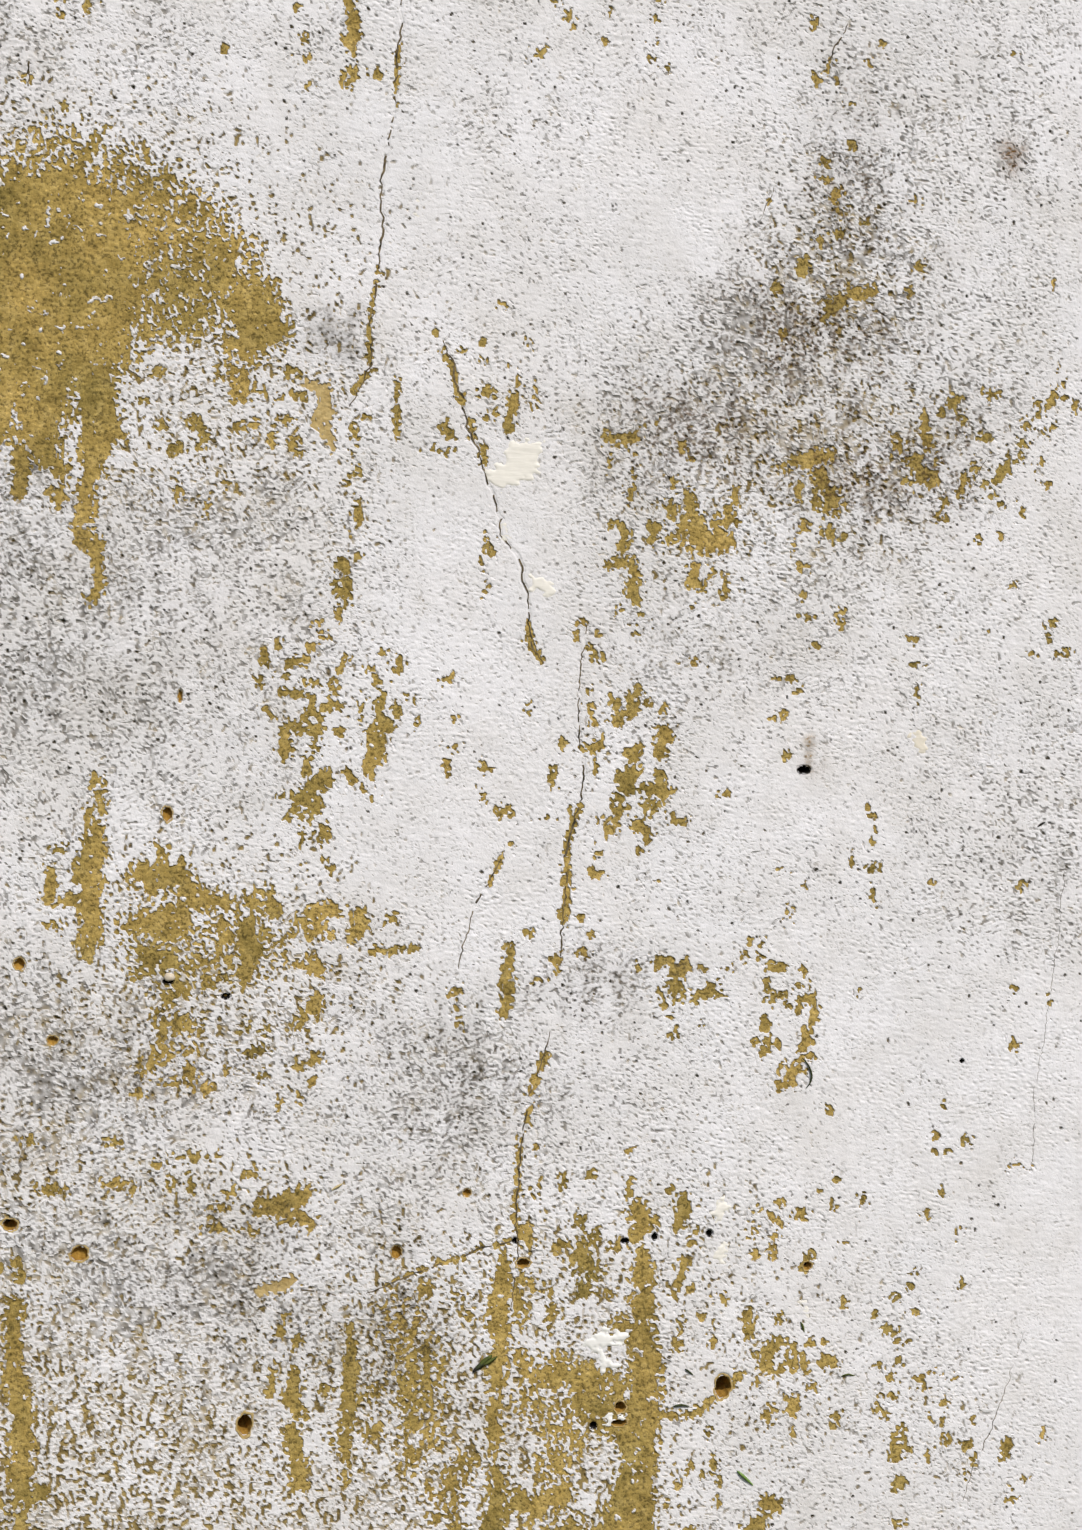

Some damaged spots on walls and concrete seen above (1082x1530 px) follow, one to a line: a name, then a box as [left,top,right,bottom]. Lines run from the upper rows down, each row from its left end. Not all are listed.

crack [342,0,405,406]
leakage [805,147,887,255]
peeling [0,99,421,877]
crack [431,323,588,969]
peeling [547,683,691,881]
peeling [600,418,742,637]
leakage [631,271,894,480]
leakage [791,393,971,525]
peeling [37,770,421,1113]
peeling [631,936,822,1094]
crack [301,1032,552,1308]
peeling [249,1146,843,1530]